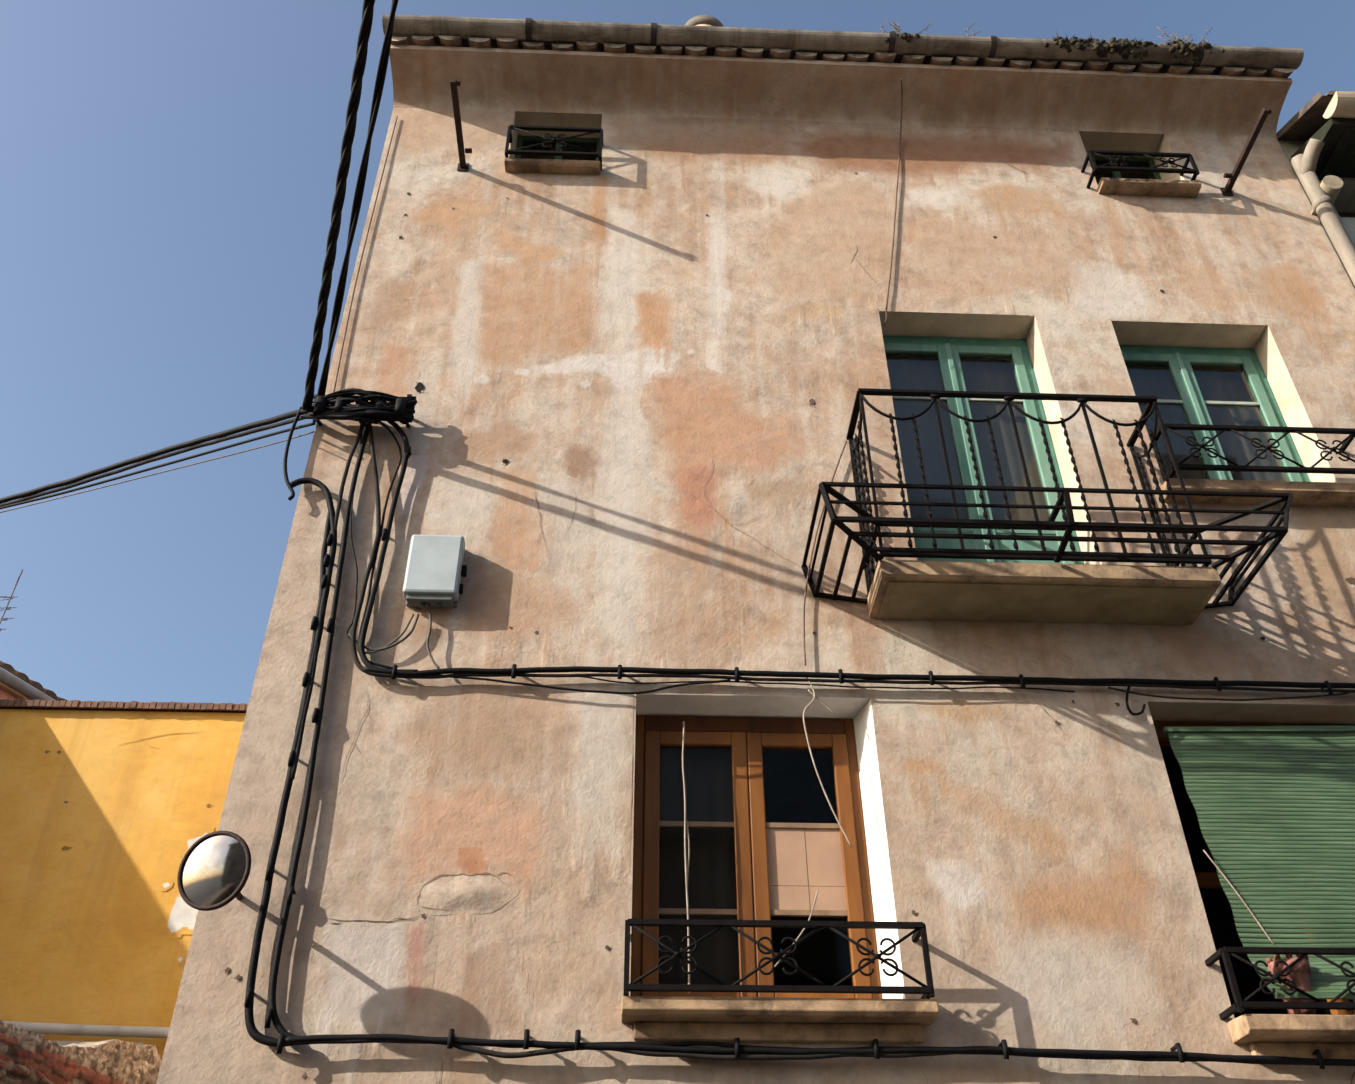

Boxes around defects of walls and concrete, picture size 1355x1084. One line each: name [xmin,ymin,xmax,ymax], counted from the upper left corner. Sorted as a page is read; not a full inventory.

peeling [159,827,215,966]
crack [329,872,511,924]